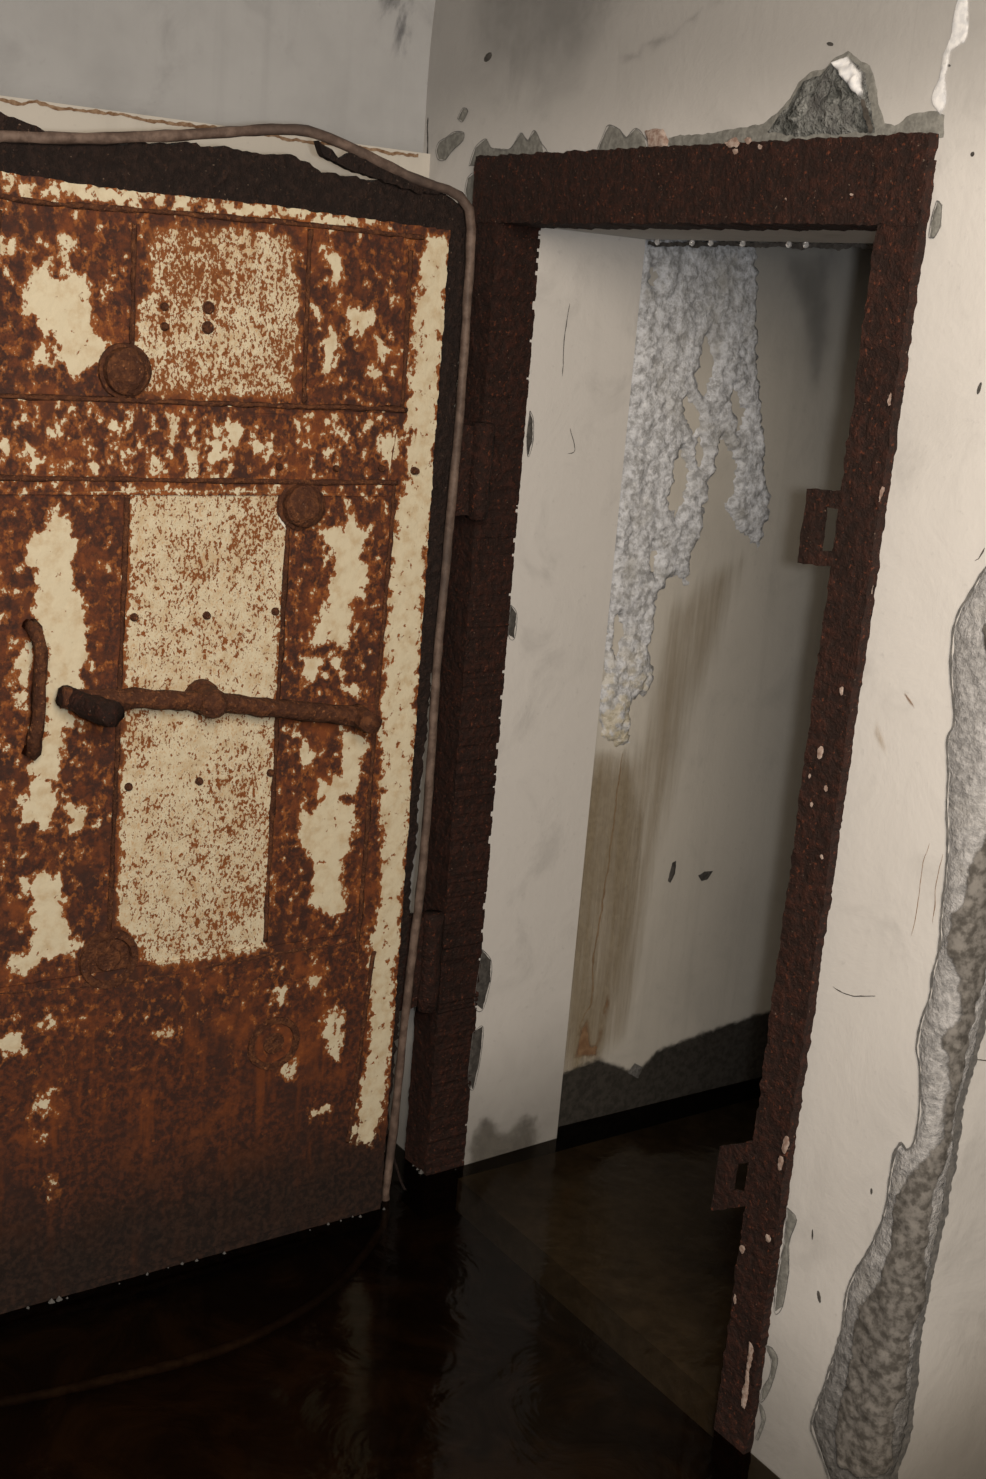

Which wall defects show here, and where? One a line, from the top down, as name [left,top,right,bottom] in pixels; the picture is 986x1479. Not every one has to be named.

spalling [597,42,945,154]
peeling [929,200,942,238]
spalling [808,567,986,1479]